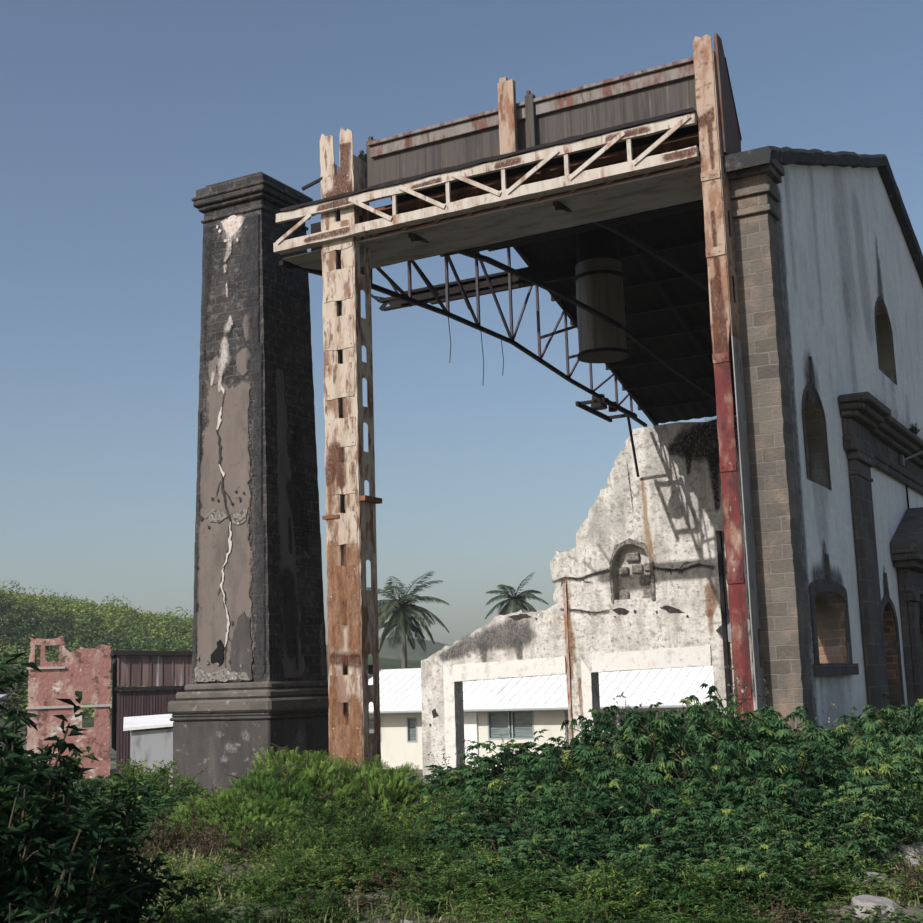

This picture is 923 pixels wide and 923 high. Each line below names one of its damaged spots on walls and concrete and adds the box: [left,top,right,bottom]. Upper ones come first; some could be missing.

spalling [216,215,247,242]
rust [304,142,352,242]
rust [663,147,696,161]
rust [699,107,714,169]
rust [710,211,729,366]
crack [216,386,232,668]
flaking render [194,312,256,682]
rust [326,442,346,524]
rust [641,478,655,570]
leakage [709,454,720,510]
rust [706,585,717,628]
rust [327,542,363,764]